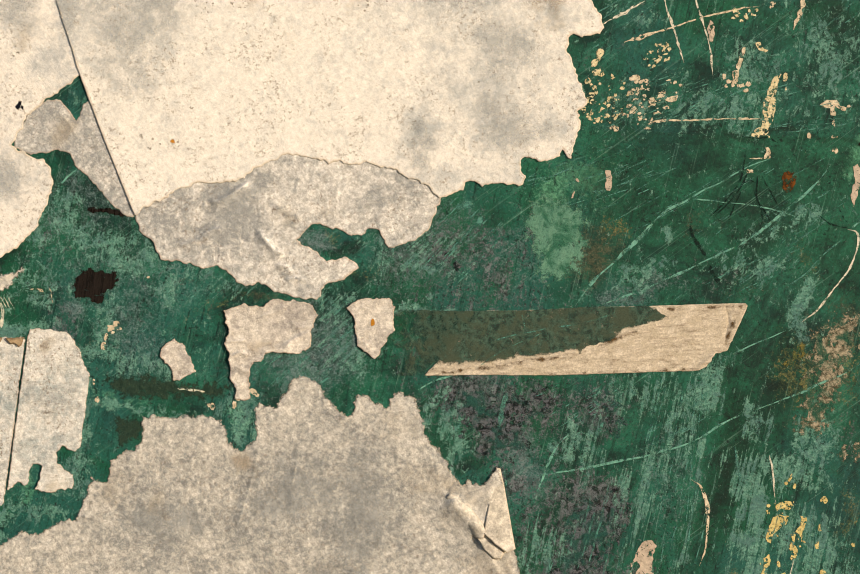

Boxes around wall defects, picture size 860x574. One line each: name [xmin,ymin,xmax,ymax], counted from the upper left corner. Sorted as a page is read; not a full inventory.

peeling [644,42,671,68]
peeling [722,42,768,92]
peeling [582,49,683,131]
peeling [751,73,788,158]
peeling [820,100,850,138]
corrosion [782,171,797,191]
peeling [101,321,122,350]
peeling [434,378,563,471]
peeling [544,481,635,574]
peeling [630,540,657,574]
peeling [766,501,794,543]
peeling [789,516,819,560]